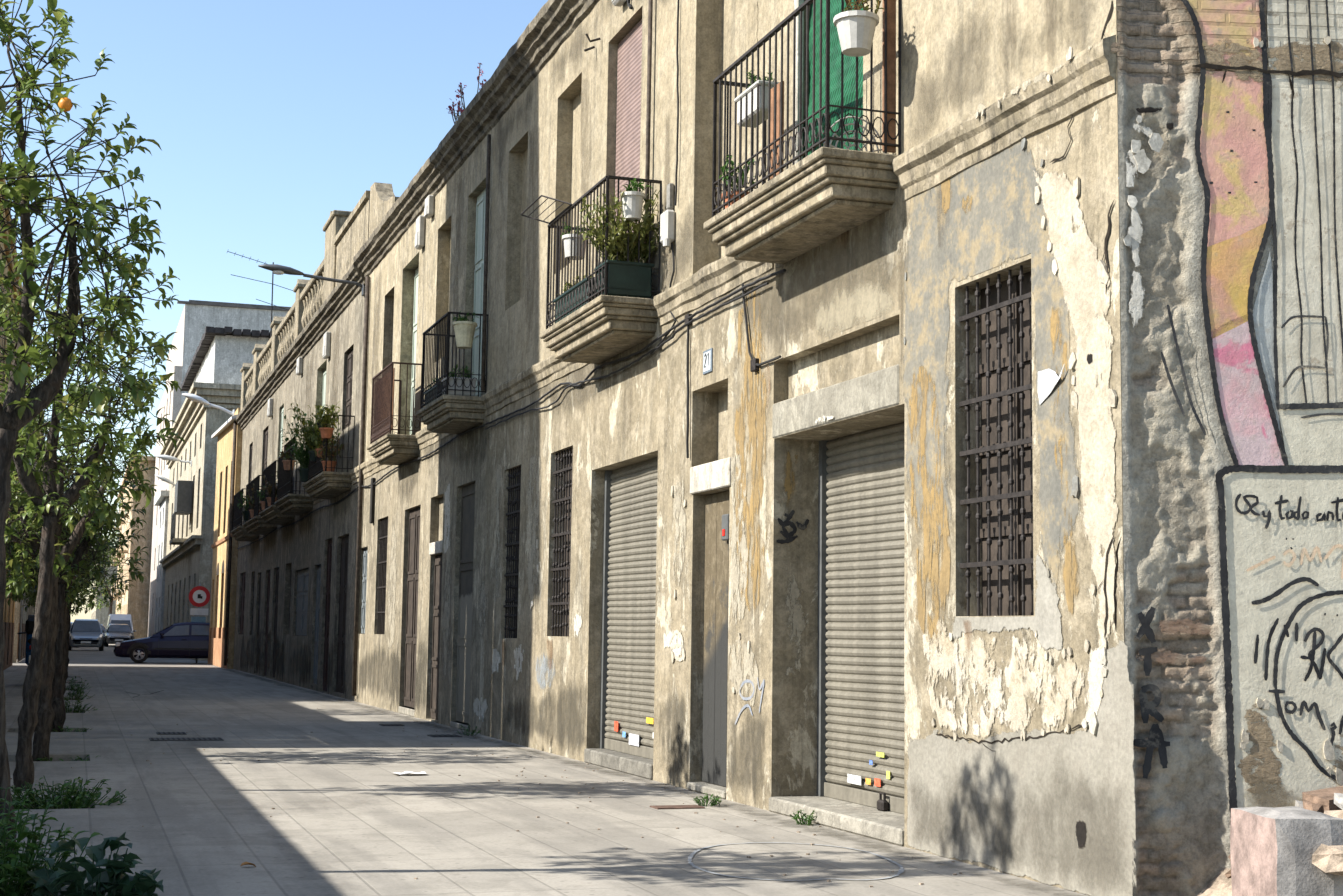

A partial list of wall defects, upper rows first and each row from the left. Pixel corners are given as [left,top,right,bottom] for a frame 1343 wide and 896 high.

peeling [1123,115,1164,327]
peeling [903,138,1118,741]
spalling [1136,618,1212,665]
leakage [328,643,399,704]
leakage [415,645,427,707]
leakage [507,688,584,747]
spalling [1238,698,1283,793]
spalling [1323,736,1343,786]